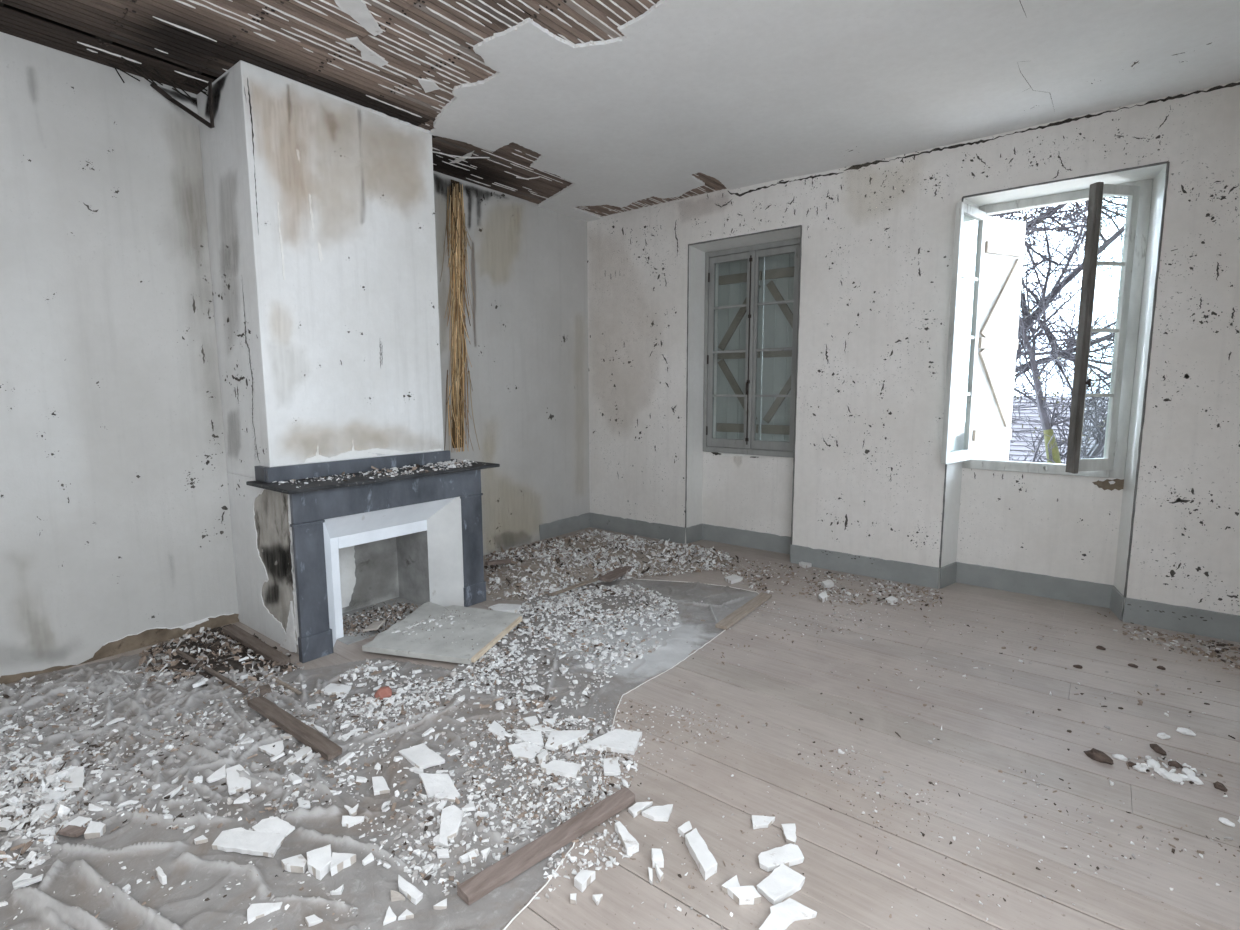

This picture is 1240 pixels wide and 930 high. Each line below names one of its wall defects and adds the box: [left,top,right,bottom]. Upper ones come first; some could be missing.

flaking render [0,0,660,205]
flaking render [572,172,727,291]
peeling [192,265,235,350]
leakage [266,551,288,602]